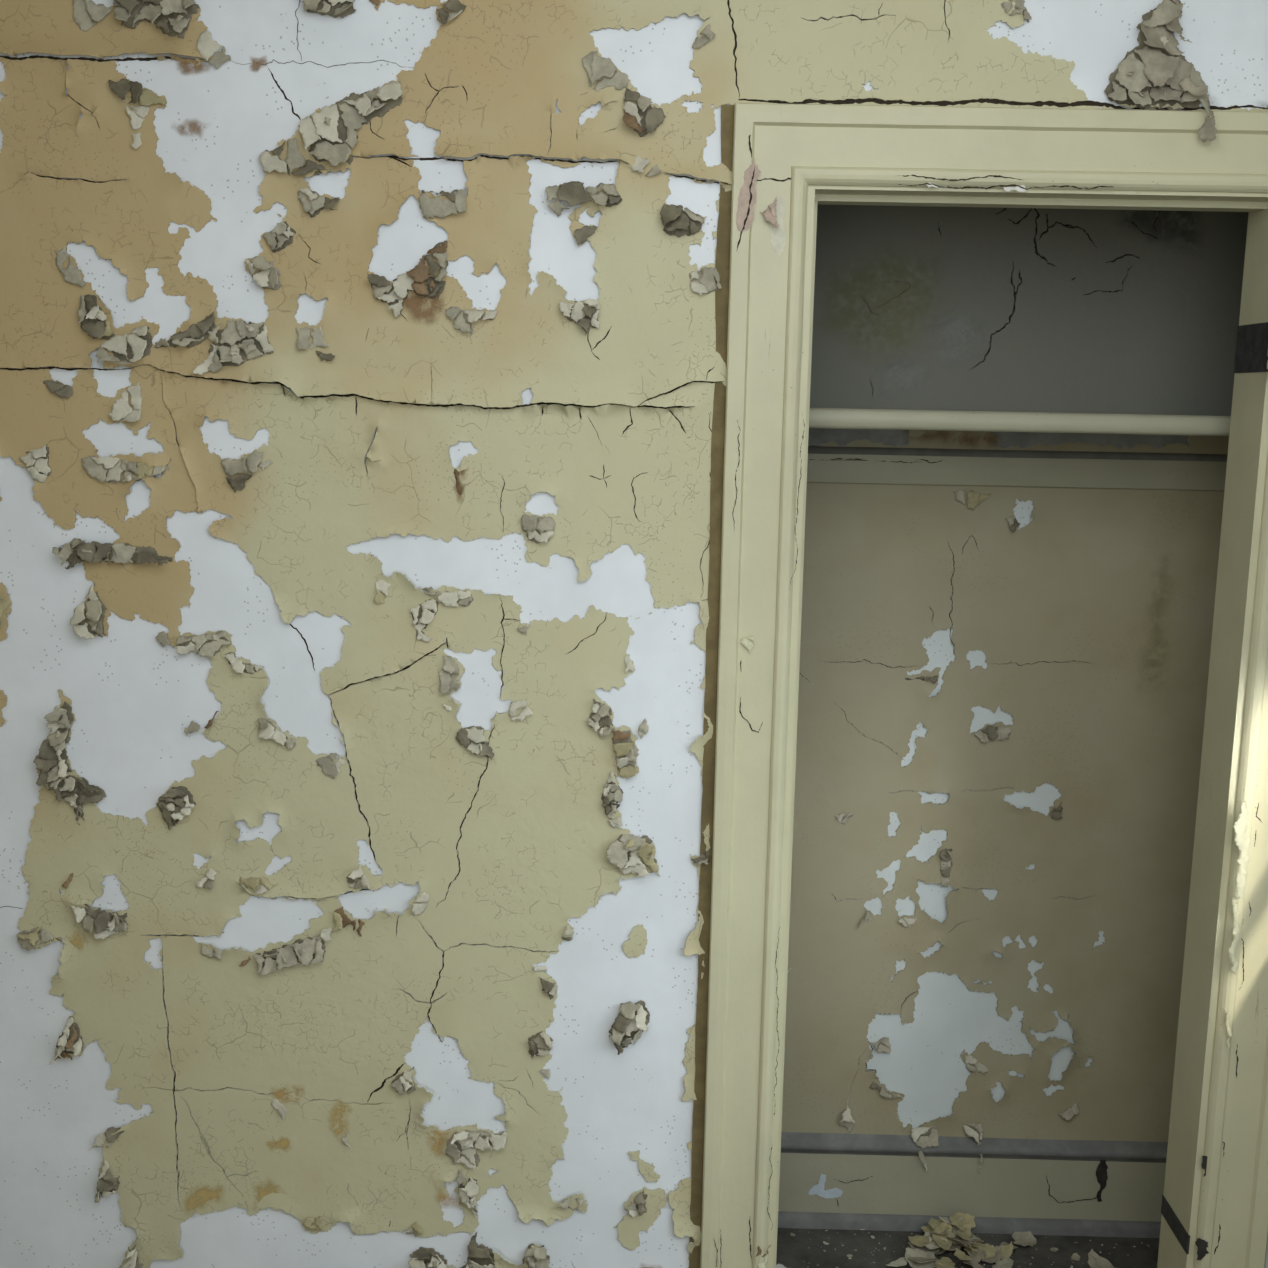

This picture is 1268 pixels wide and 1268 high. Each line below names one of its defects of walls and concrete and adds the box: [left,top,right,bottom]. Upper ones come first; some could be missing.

crack [360,114,618,167]
crack [669,135,791,249]
crack [727,0,1268,111]
peeling [987,0,1268,142]
crack [0,364,740,600]
peeling [0,0,730,1268]
peeling [905,628,987,696]
crack [290,624,449,859]
crack [396,601,560,1042]
peeling [864,828,957,928]
peeling [1004,783,1063,820]
peeling [867,935,1074,1171]